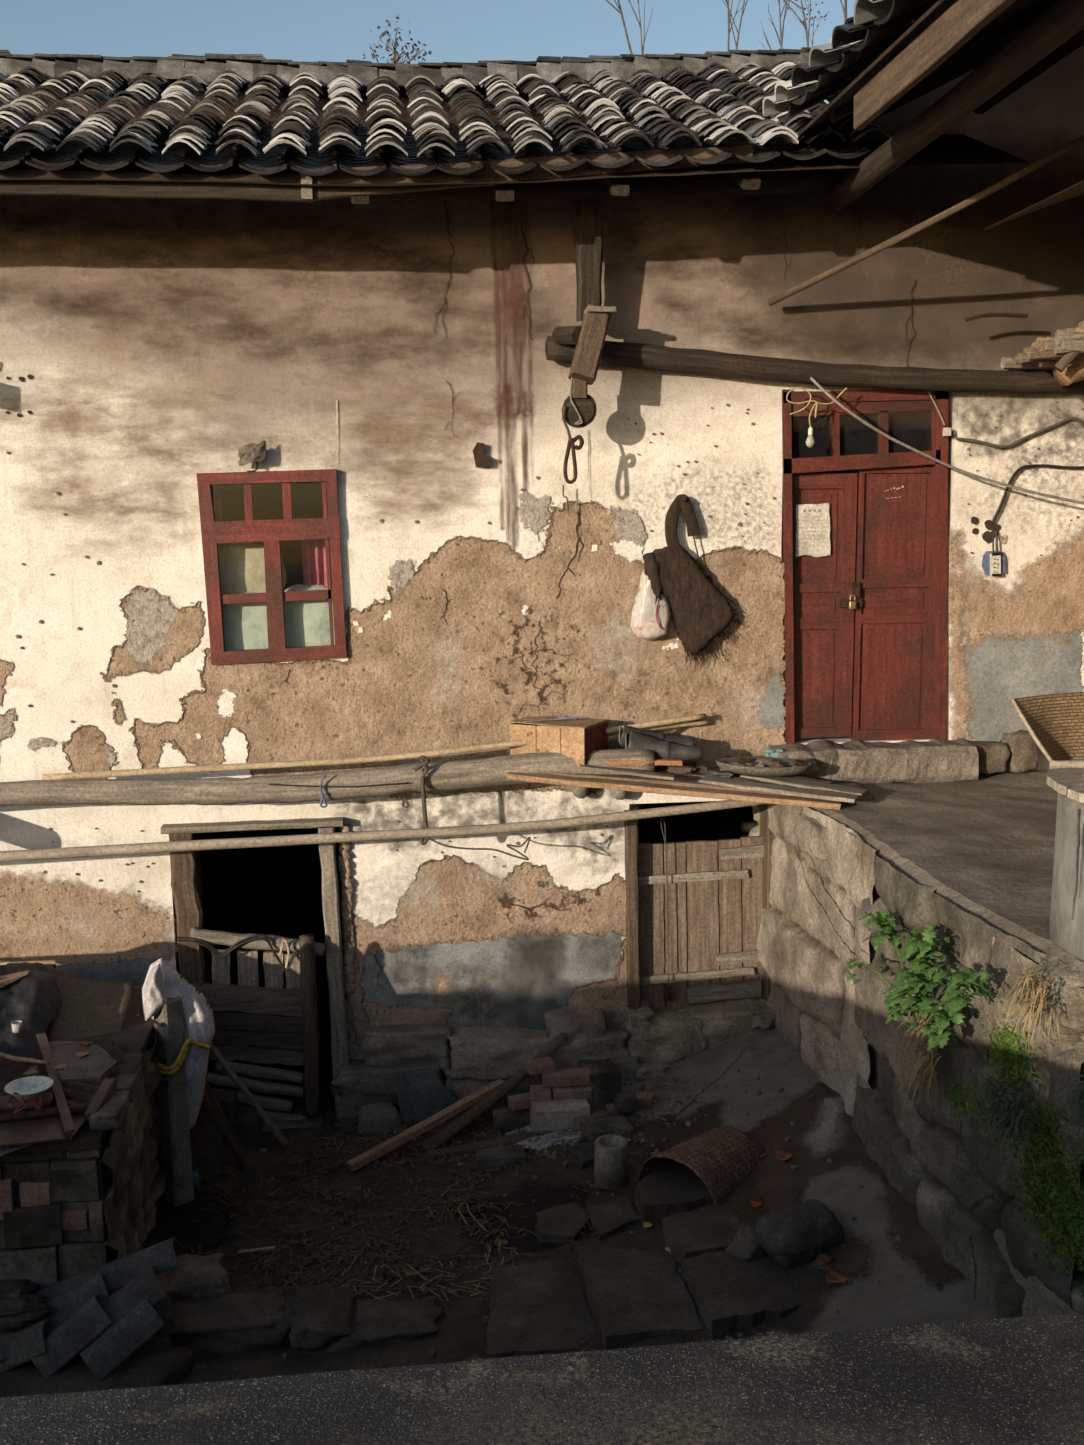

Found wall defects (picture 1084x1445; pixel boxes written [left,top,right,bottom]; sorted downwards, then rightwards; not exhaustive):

corrosion [491,200,532,550]
peeling [0,634,32,740]
peeling [27,476,786,780]
peeling [373,783,609,798]
crack [499,511,584,713]
peeling [947,516,1084,741]
peeling [0,862,178,966]
peeling [337,840,627,1058]